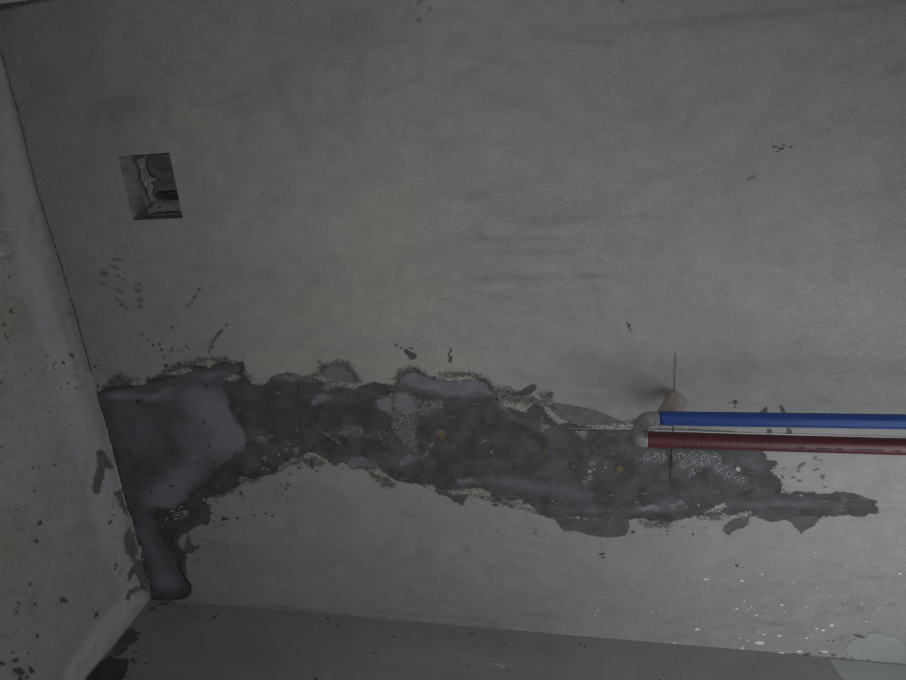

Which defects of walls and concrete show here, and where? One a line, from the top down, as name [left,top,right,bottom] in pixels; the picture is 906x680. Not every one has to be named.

leakage [93,333,247,600]
spalling [98,356,880,601]